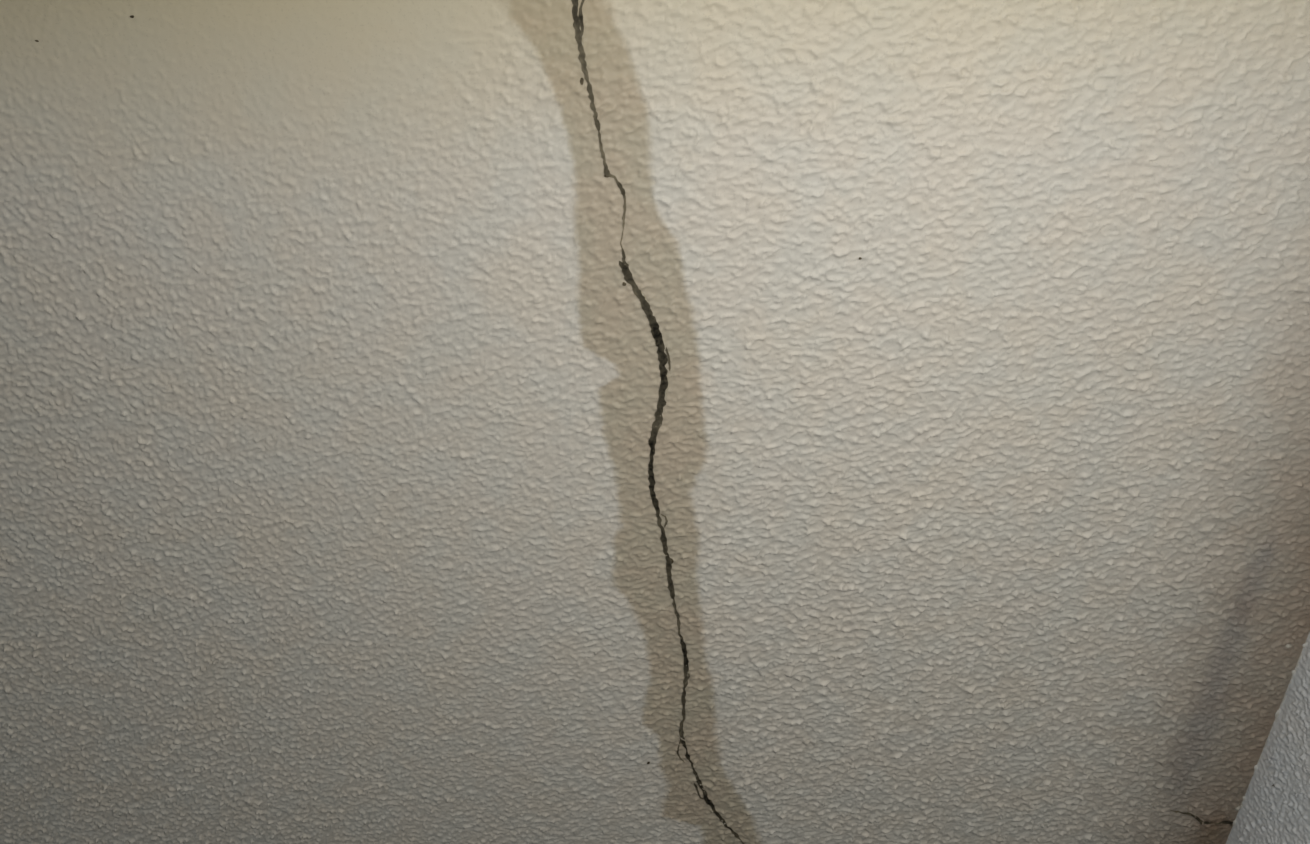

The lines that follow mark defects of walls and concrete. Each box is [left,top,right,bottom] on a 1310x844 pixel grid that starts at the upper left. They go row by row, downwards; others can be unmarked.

crack [572,0,744,844]